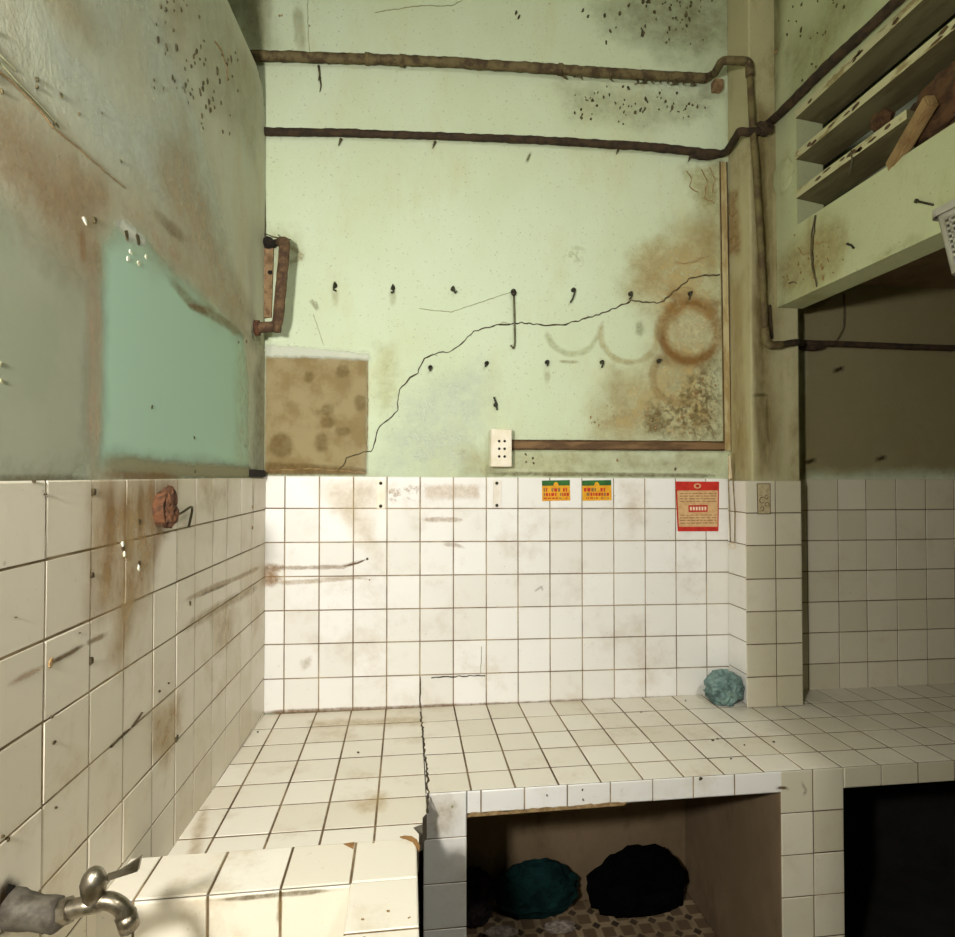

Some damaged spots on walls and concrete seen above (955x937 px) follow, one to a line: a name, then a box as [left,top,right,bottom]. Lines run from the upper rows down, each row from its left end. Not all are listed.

crack [0,54,125,188]
damp [152,0,239,130]
crack [375,0,463,13]
mould [574,85,706,125]
mould [605,0,713,45]
peeling [118,220,148,266]
crack [338,255,720,471]
damp [590,239,717,441]
corrosion [90,481,157,628]
crack [419,647,485,814]